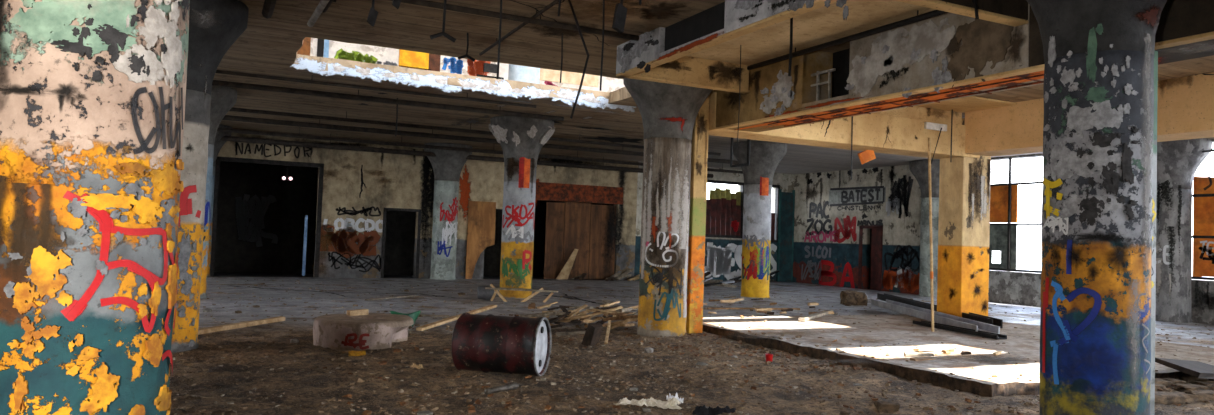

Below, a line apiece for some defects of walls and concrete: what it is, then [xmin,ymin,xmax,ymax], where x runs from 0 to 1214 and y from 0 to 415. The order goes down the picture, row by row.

spalling [55,85,84,111]
peeling [10,0,184,88]
peeling [736,17,1140,226]
peeling [0,159,197,415]